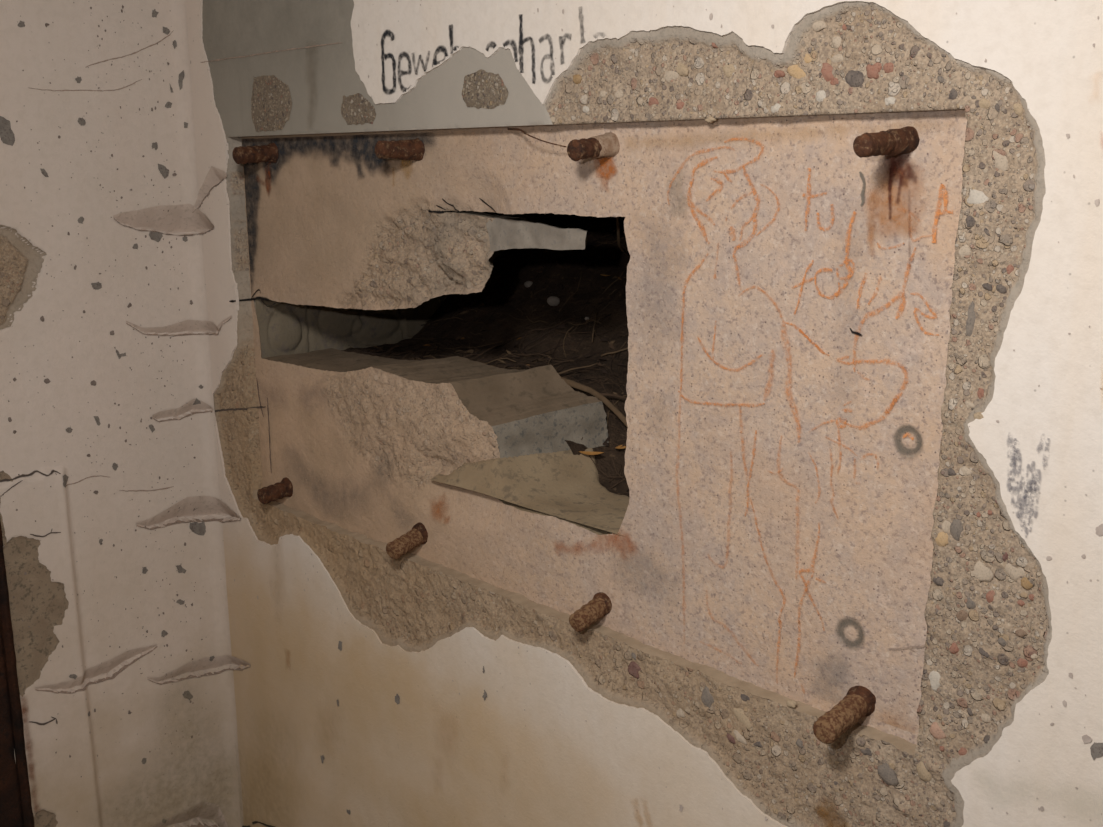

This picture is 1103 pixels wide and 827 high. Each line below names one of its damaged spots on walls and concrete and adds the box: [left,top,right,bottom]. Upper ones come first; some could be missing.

corrosion [598,157,615,179]
corrosion [878,154,915,226]
flaking render [0,225,47,329]
spalling [193,0,1052,827]
flaking render [0,498,69,697]